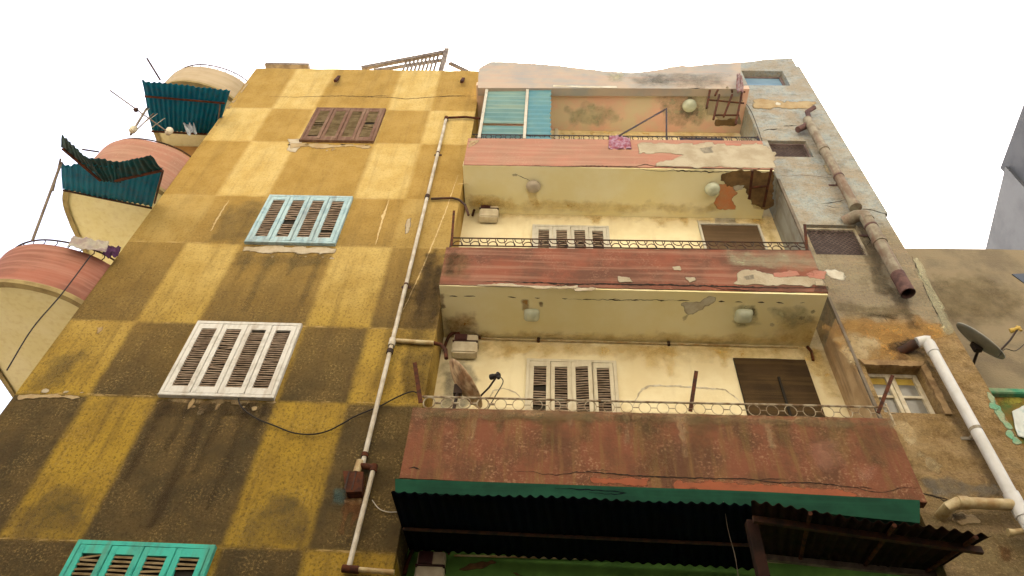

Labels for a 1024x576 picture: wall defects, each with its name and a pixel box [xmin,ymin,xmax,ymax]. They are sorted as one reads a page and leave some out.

peeling [637,142,776,223]
peeling [734,269,846,292]
spalling [681,296,715,314]
damp [839,317,946,360]
crack [518,470,948,502]